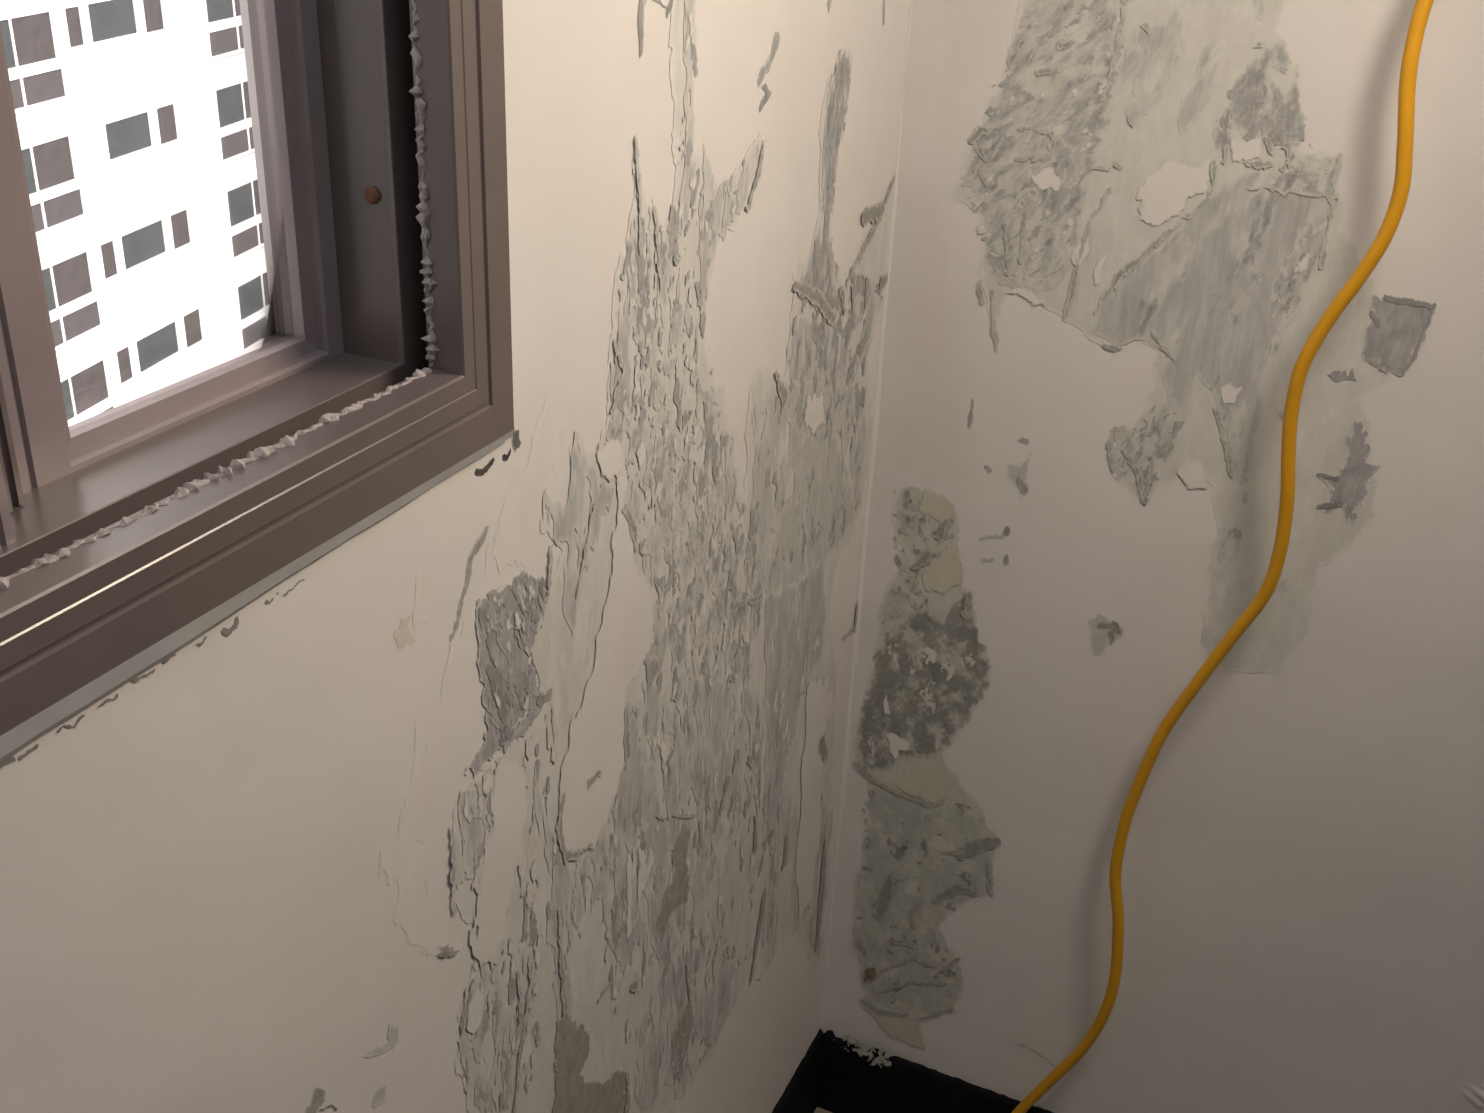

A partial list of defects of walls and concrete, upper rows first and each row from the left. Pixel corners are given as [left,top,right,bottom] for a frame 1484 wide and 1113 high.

peeling [437,0,896,1113]
peeling [954,0,1437,677]
peeling [306,1087,337,1113]